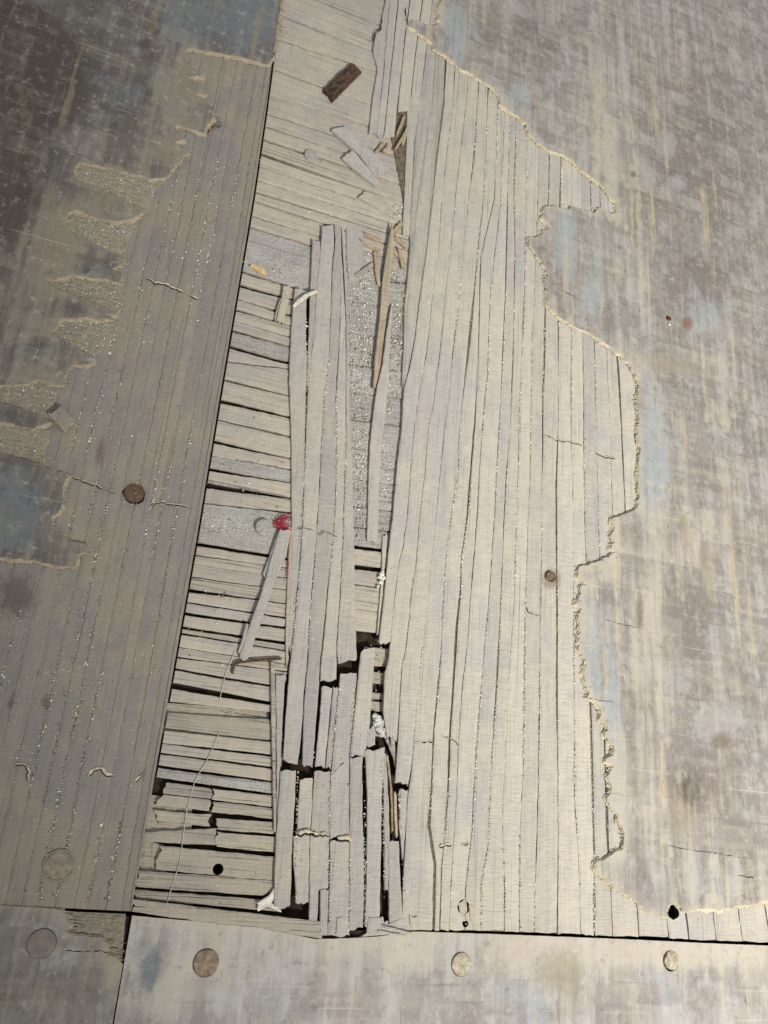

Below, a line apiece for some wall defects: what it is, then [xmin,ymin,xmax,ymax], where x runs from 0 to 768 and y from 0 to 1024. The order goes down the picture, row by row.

crack [543,434,615,459]
peeling [270,0,768,943]
peeling [0,52,273,962]
crack [293,829,352,843]
crack [439,841,469,849]